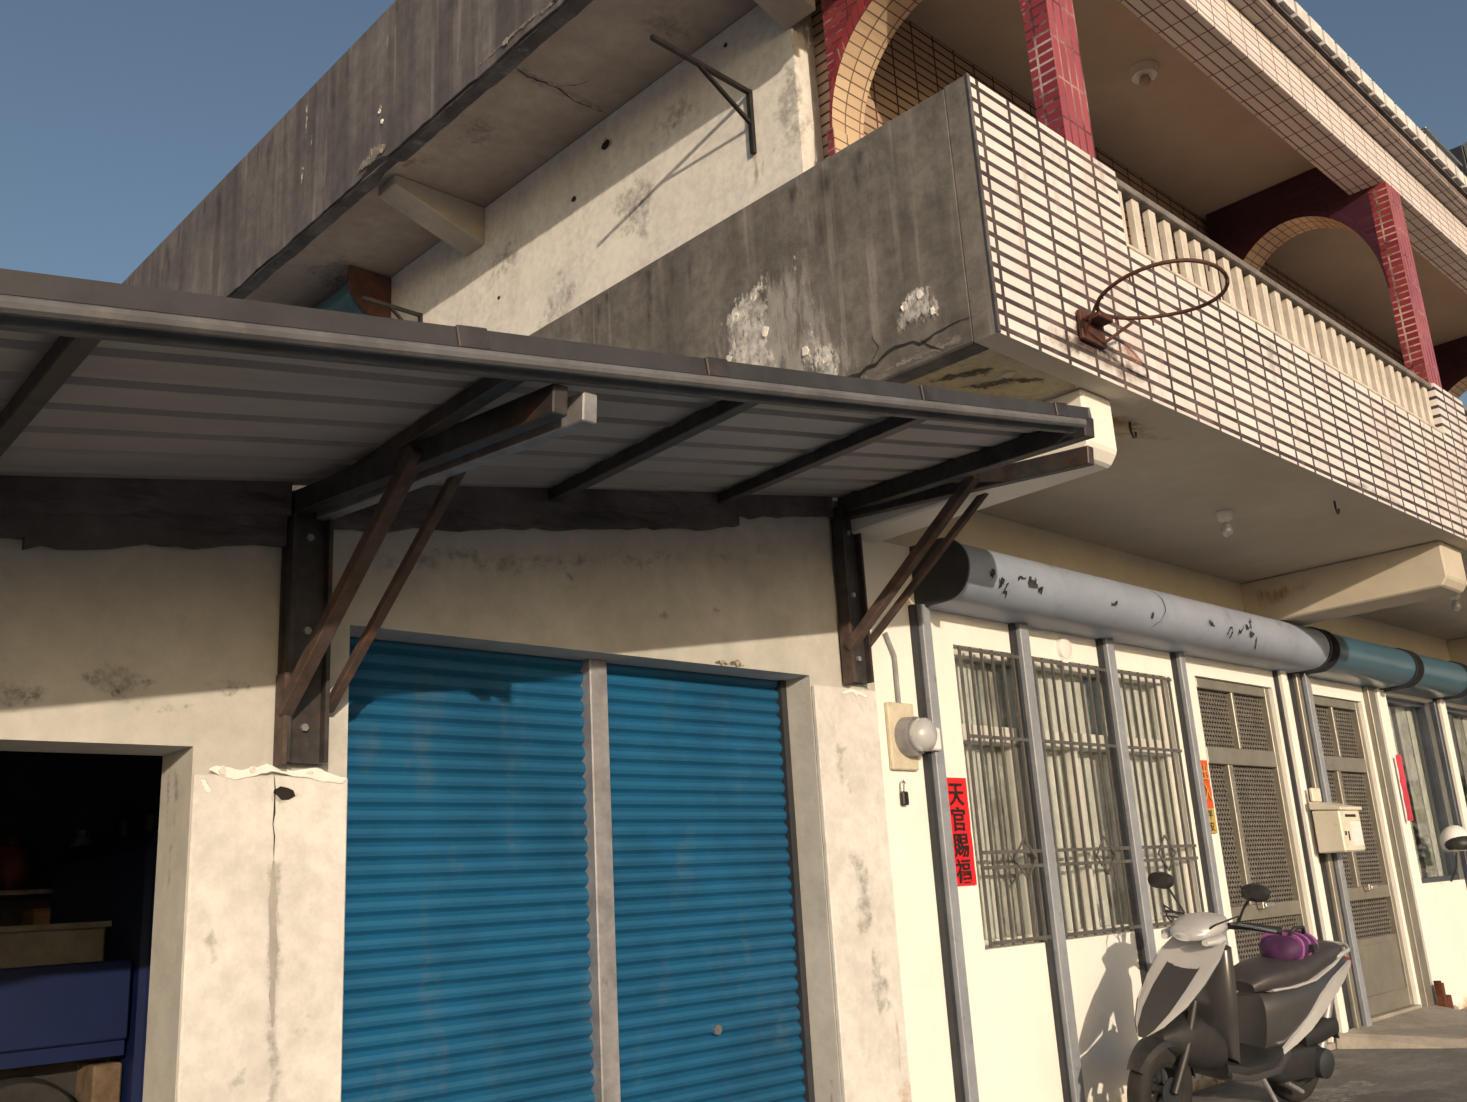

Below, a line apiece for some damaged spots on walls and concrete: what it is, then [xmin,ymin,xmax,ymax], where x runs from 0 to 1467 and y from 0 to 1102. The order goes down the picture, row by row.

crack [516,68,607,114]
peeling [721,277,777,368]
peeling [802,323,839,375]
crack [848,317,970,379]
peeling [898,286,942,330]
crack [268,861,278,1027]